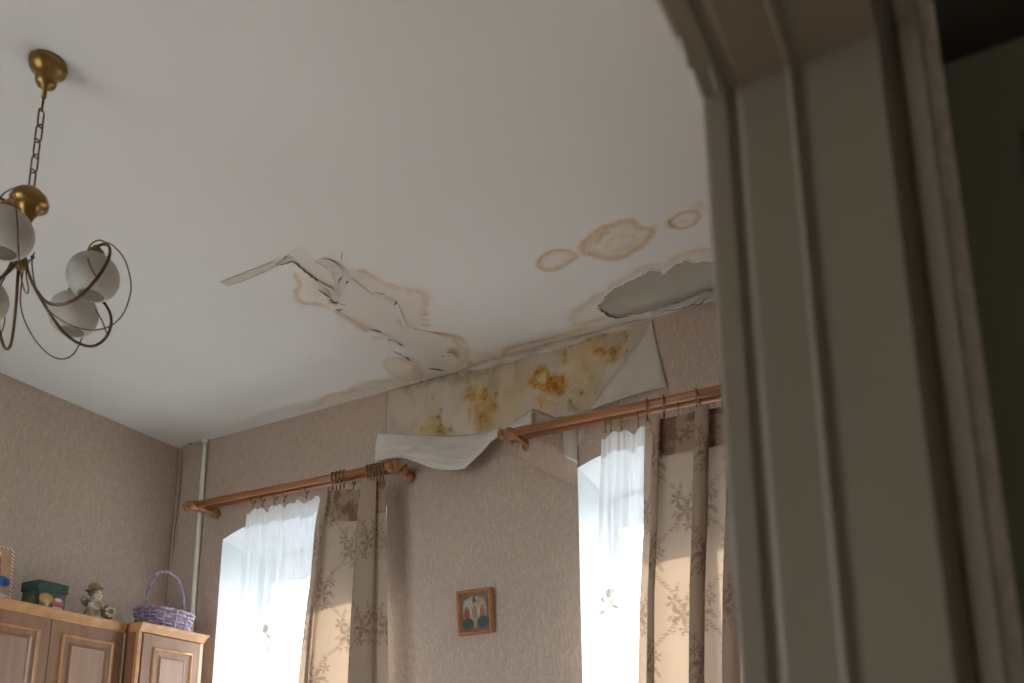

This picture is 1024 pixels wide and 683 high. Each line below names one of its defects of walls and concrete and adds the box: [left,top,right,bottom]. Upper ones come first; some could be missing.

peeling [220,252,443,337]
peeling [386,257,715,436]